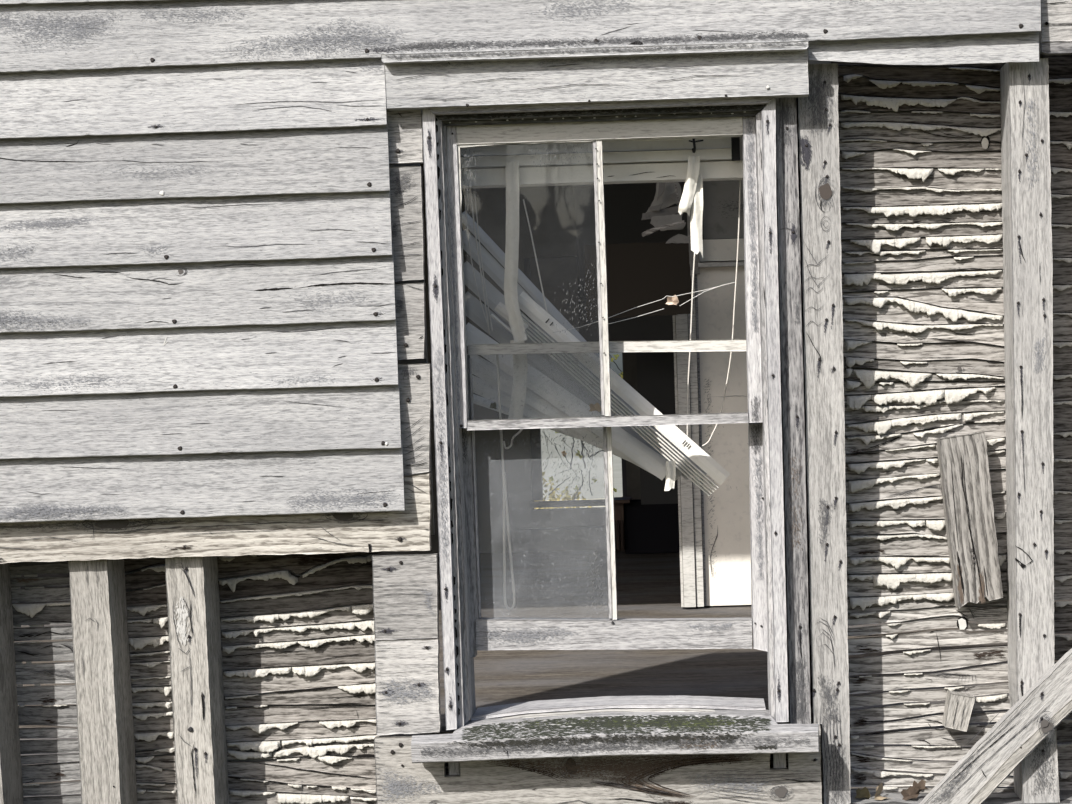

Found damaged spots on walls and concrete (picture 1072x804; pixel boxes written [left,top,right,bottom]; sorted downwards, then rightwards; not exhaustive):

crack [0,140,162,163]
flaking render [841,74,1003,346]
crack [55,252,187,323]
crack [215,189,423,366]
flaking render [845,340,1005,541]
flaking render [221,604,375,654]
flaking render [849,557,954,639]
leakage [972,647,1006,660]
leakage [789,655,841,725]
flaking render [226,719,380,764]
leakage [417,736,810,804]
leakage [1029,731,1057,797]